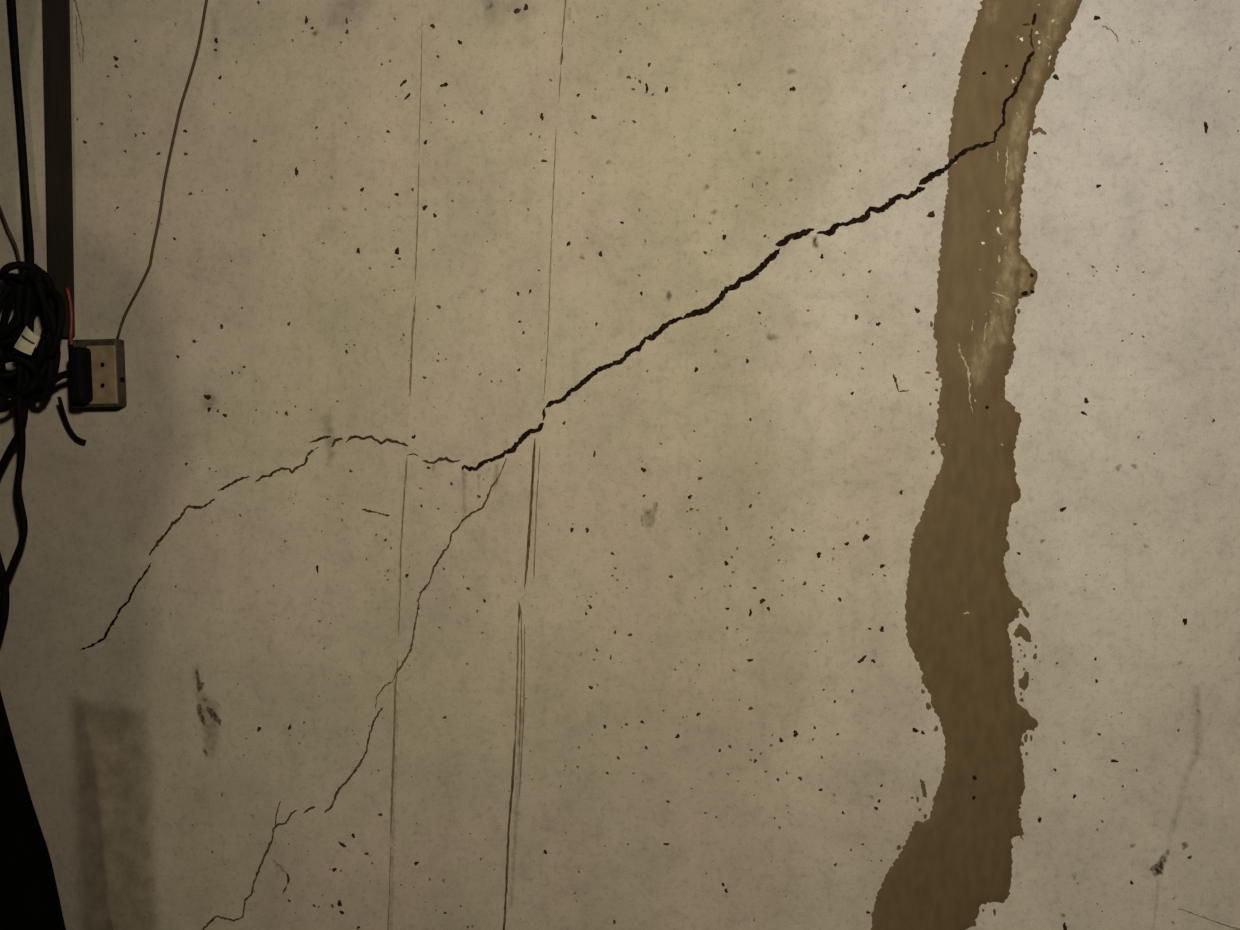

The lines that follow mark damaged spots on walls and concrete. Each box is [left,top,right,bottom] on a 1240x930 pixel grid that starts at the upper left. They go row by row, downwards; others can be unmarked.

crack [73,0,84,61]
crack [81,13,1037,930]